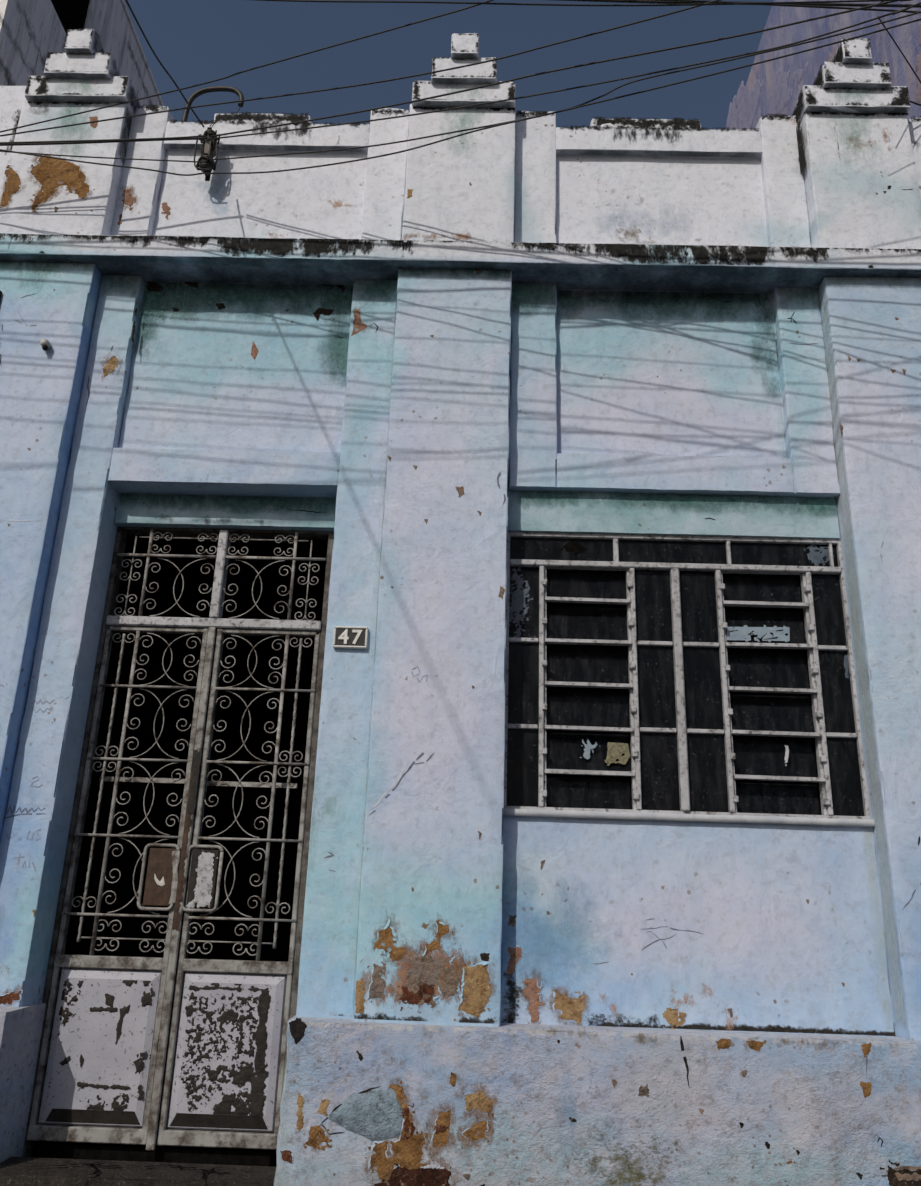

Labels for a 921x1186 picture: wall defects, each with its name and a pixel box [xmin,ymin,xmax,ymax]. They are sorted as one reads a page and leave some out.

water stain [0,29,553,163]
water stain [560,38,921,174]
spalling [0,155,95,214]
water stain [0,233,921,382]
peeling [55,979,86,1038]
peeling [59,1051,147,1111]
peeling [90,980,154,1044]
peeling [180,983,271,1116]
spalling [279,1093,332,1164]
spalling [365,1072,497,1186]
spalling [355,918,587,1026]
spalling [880,1160,921,1186]